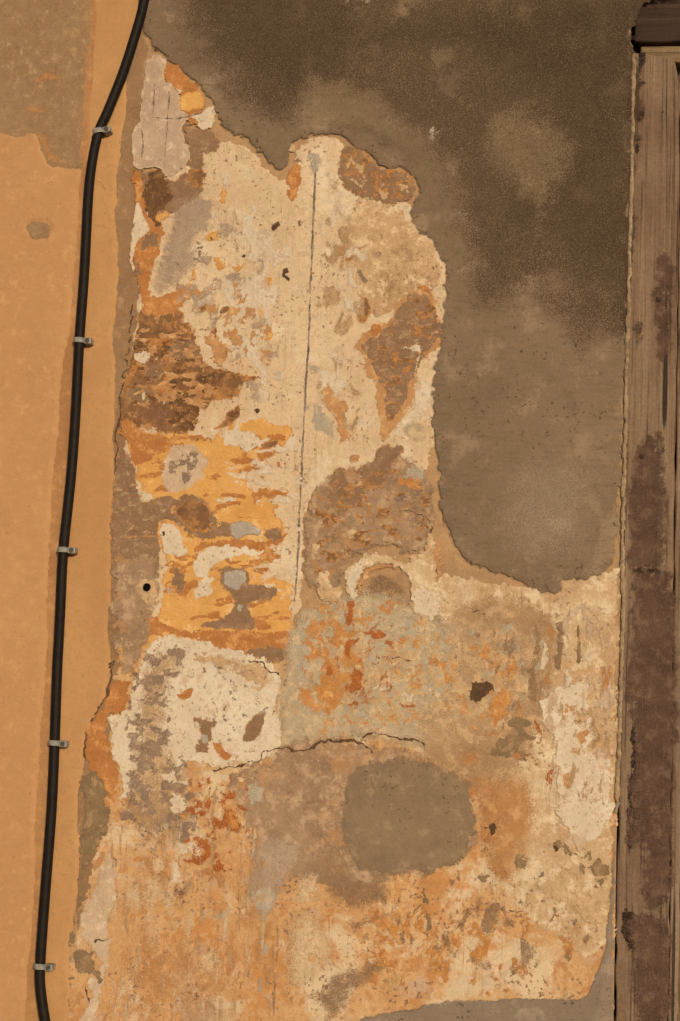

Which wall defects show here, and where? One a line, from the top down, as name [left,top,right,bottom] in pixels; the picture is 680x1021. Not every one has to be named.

spalling [0,0,91,169]
peeling [67,55,451,1021]
crack [210,732,425,772]
peeling [326,53,680,1021]